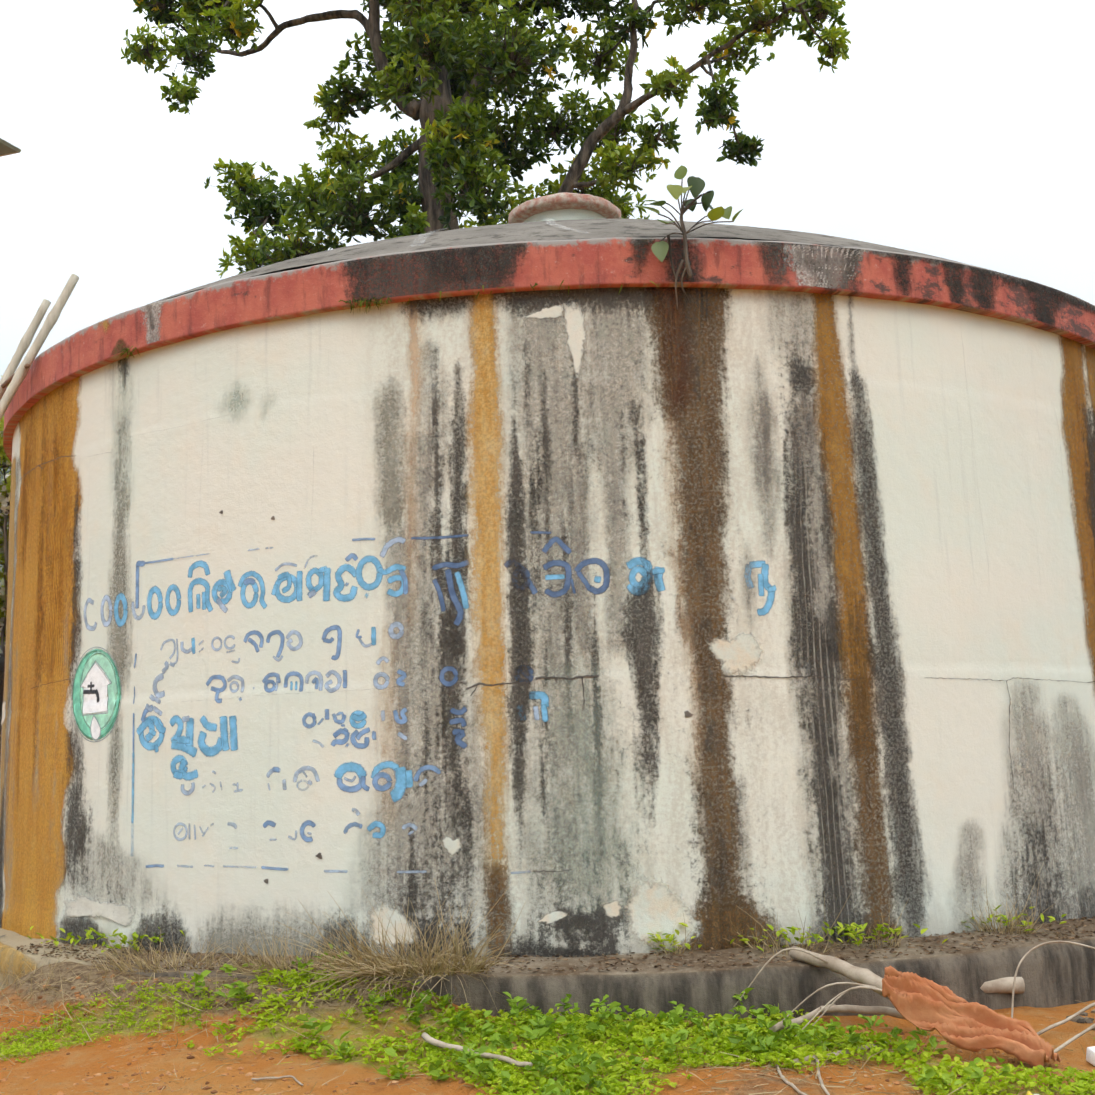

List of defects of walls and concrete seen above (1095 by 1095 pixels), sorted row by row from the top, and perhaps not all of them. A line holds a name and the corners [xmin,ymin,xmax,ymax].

rust [0,376,82,941]
leakage [71,494,82,688]
leakage [59,916,107,946]
leakage [64,720,136,908]
leakage [110,480,130,683]
rust [468,294,516,957]
peeling [522,302,586,377]
leakage [344,239,784,958]
rust [814,293,900,940]
leakage [757,241,1095,944]
rust [1060,335,1095,684]